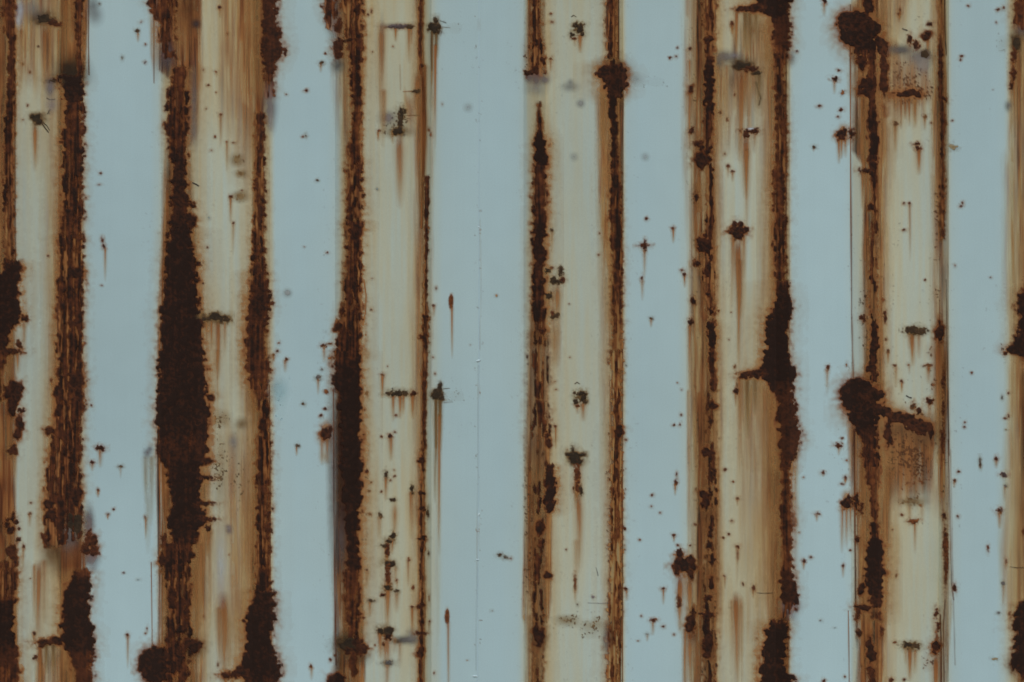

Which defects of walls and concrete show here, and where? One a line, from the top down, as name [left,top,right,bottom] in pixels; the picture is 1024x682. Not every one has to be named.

corrosion [0,0,104,682]
corrosion [135,0,288,682]
corrosion [316,0,396,682]
corrosion [408,0,437,682]
corrosion [497,102,561,682]
corrosion [592,0,631,682]
corrosion [668,0,739,682]
corrosion [730,0,812,682]
corrosion [832,0,960,682]
corrosion [992,571,1024,682]
corrosion [995,0,1024,439]